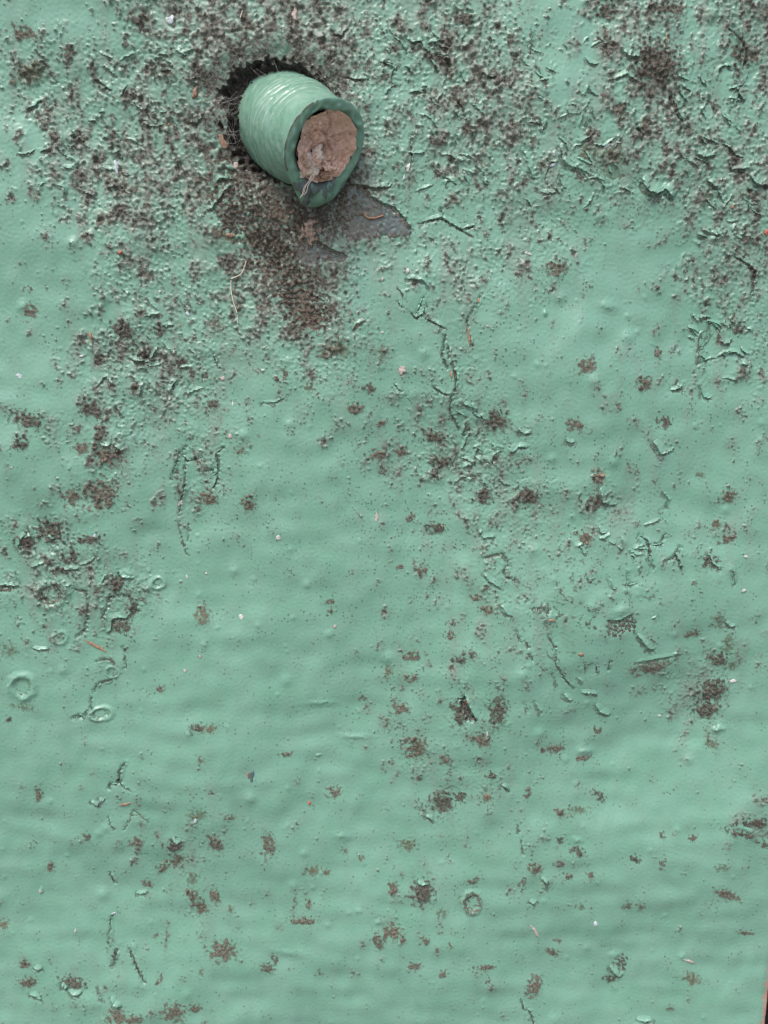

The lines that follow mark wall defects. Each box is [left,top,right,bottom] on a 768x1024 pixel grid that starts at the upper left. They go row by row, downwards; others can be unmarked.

peeling [608,48,641,84]
peeling [88,45,202,196]
spalling [203,53,424,339]
crack [418,206,475,238]
peeling [521,84,629,208]
peeling [622,136,768,244]
peeling [121,286,206,401]
peeling [688,313,753,380]
peeling [454,401,531,487]
crack [170,444,223,554]
peeling [0,556,95,592]
peeling [559,571,681,664]